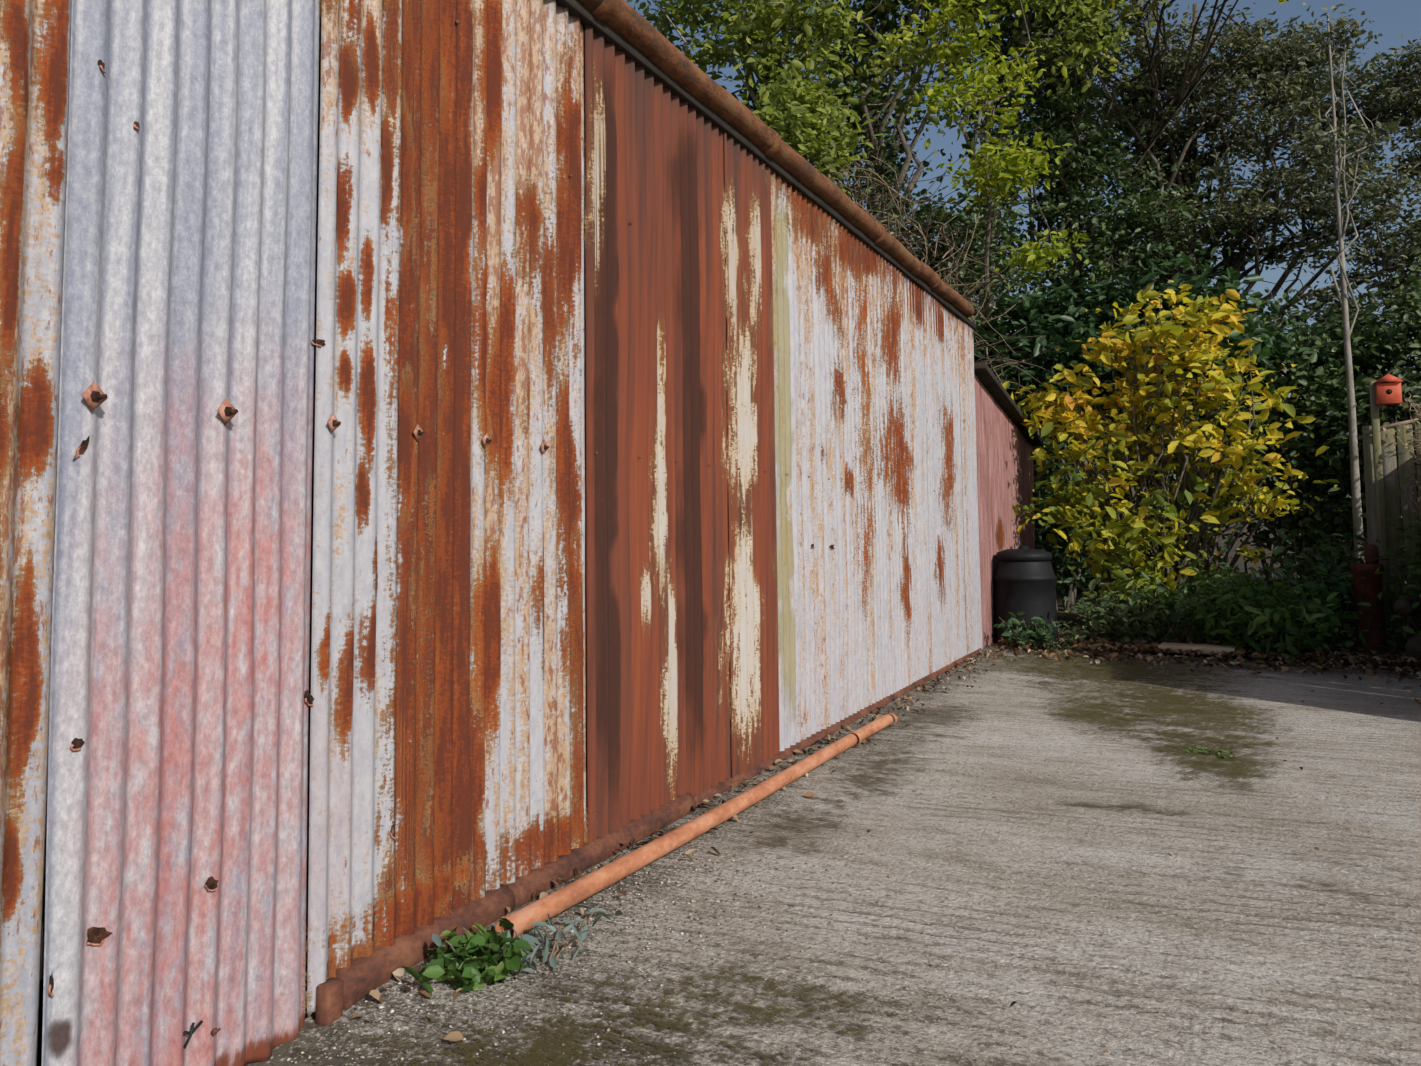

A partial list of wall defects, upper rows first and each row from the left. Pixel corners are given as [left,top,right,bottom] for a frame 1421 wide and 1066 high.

corrosion [0,0,69,935]
corrosion [307,0,589,979]
corrosion [762,163,949,642]
corrosion [934,393,956,605]
corrosion [995,518,1006,551]